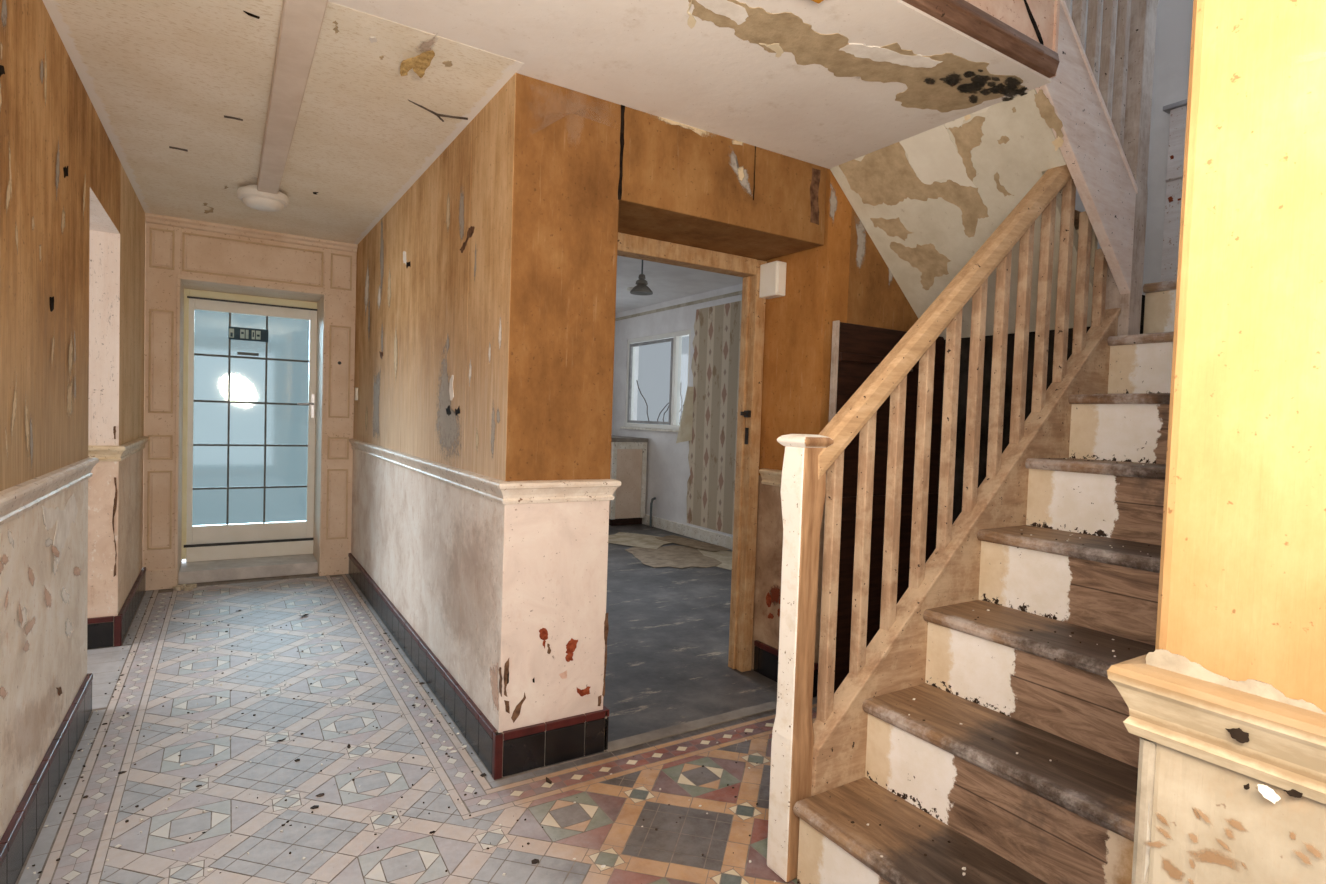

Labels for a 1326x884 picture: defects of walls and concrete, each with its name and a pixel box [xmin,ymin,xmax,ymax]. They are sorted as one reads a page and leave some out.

peeling [400,40,453,78]
damp [924,69,1027,103]
peeling [658,117,708,135]
peeling [687,0,1064,290]
peeling [365,220,411,436]
peeling [437,334,500,456]
rust [766,585,781,619]
rust [539,628,578,662]
spalling [490,663,502,711]
peeling [1147,808,1247,884]
peeling [1290,832,1322,864]